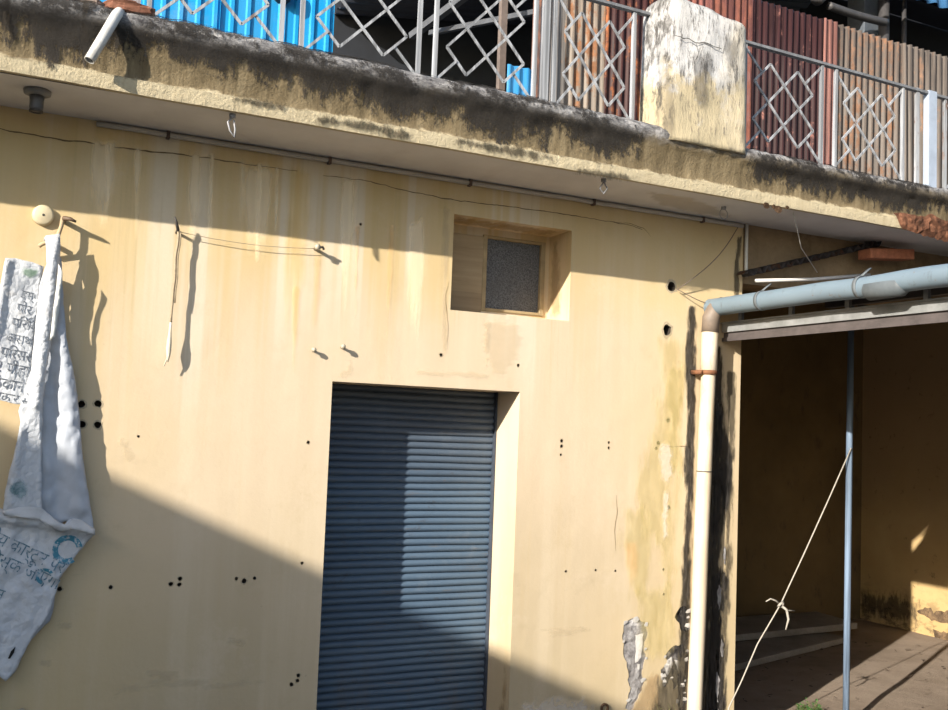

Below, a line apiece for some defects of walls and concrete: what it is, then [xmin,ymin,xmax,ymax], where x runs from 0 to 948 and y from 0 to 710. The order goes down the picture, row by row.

damp [233,98,284,110]
mould [318,117,409,139]
crack [0,128,297,171]
mould [456,139,547,159]
damp [578,169,629,180]
damp [652,306,696,710]
damp [702,346,736,710]
flaking render [675,608,691,629]
damp [862,594,916,621]
peeling [622,616,648,710]
peeling [660,645,689,702]